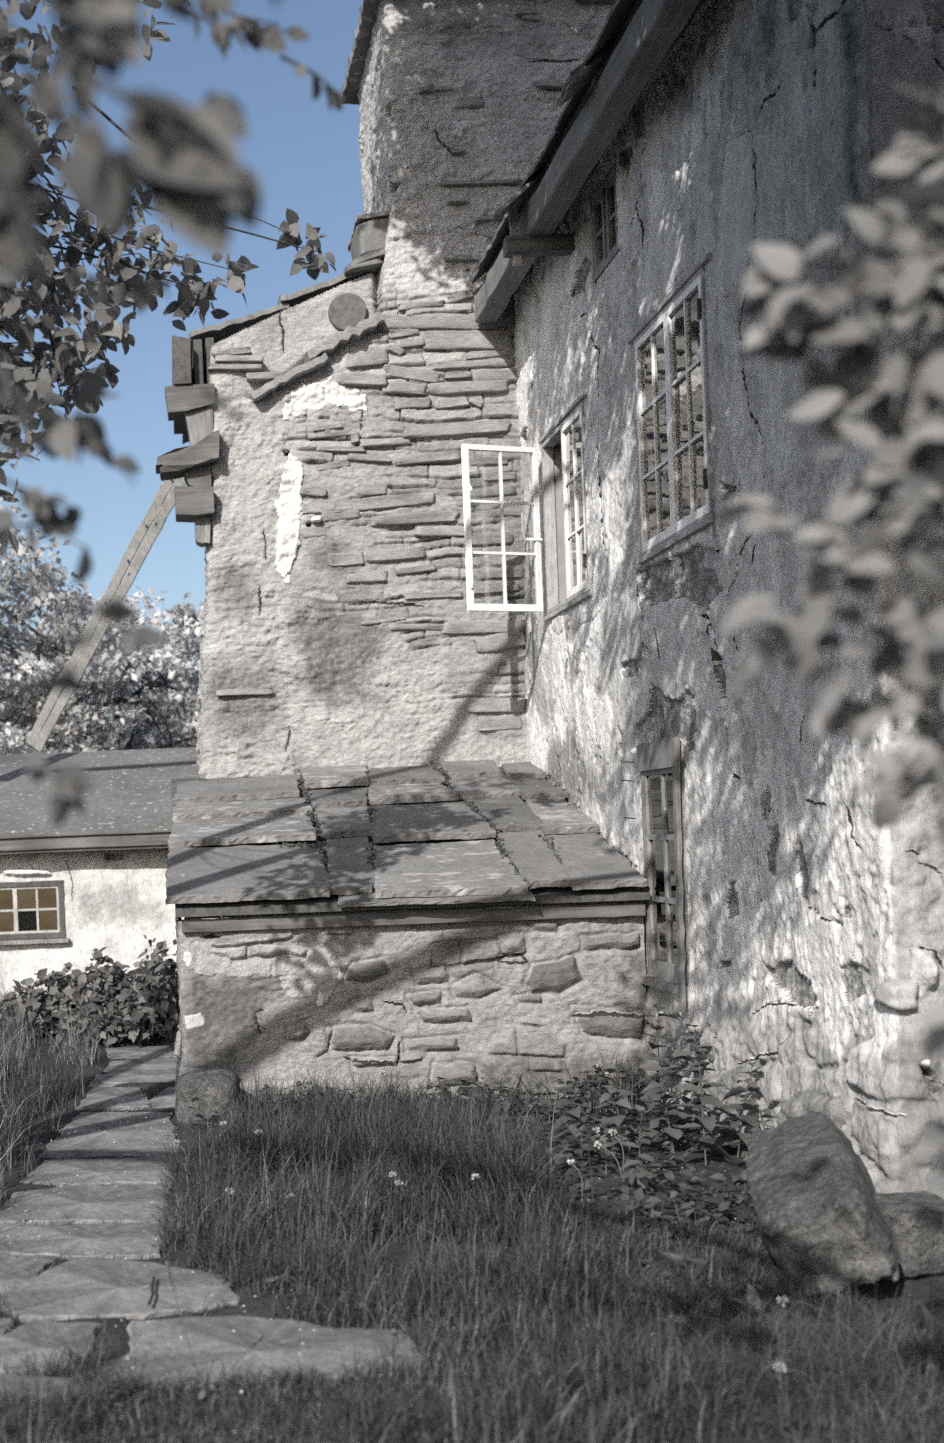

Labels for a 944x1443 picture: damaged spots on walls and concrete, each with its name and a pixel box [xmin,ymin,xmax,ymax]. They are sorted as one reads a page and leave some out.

crack [731,0,846,263]
crack [739,295,766,478]
flaking render [635,532,741,617]
flaking render [619,643,697,755]
flaking render [764,961,820,1017]
flaking render [837,954,870,1003]